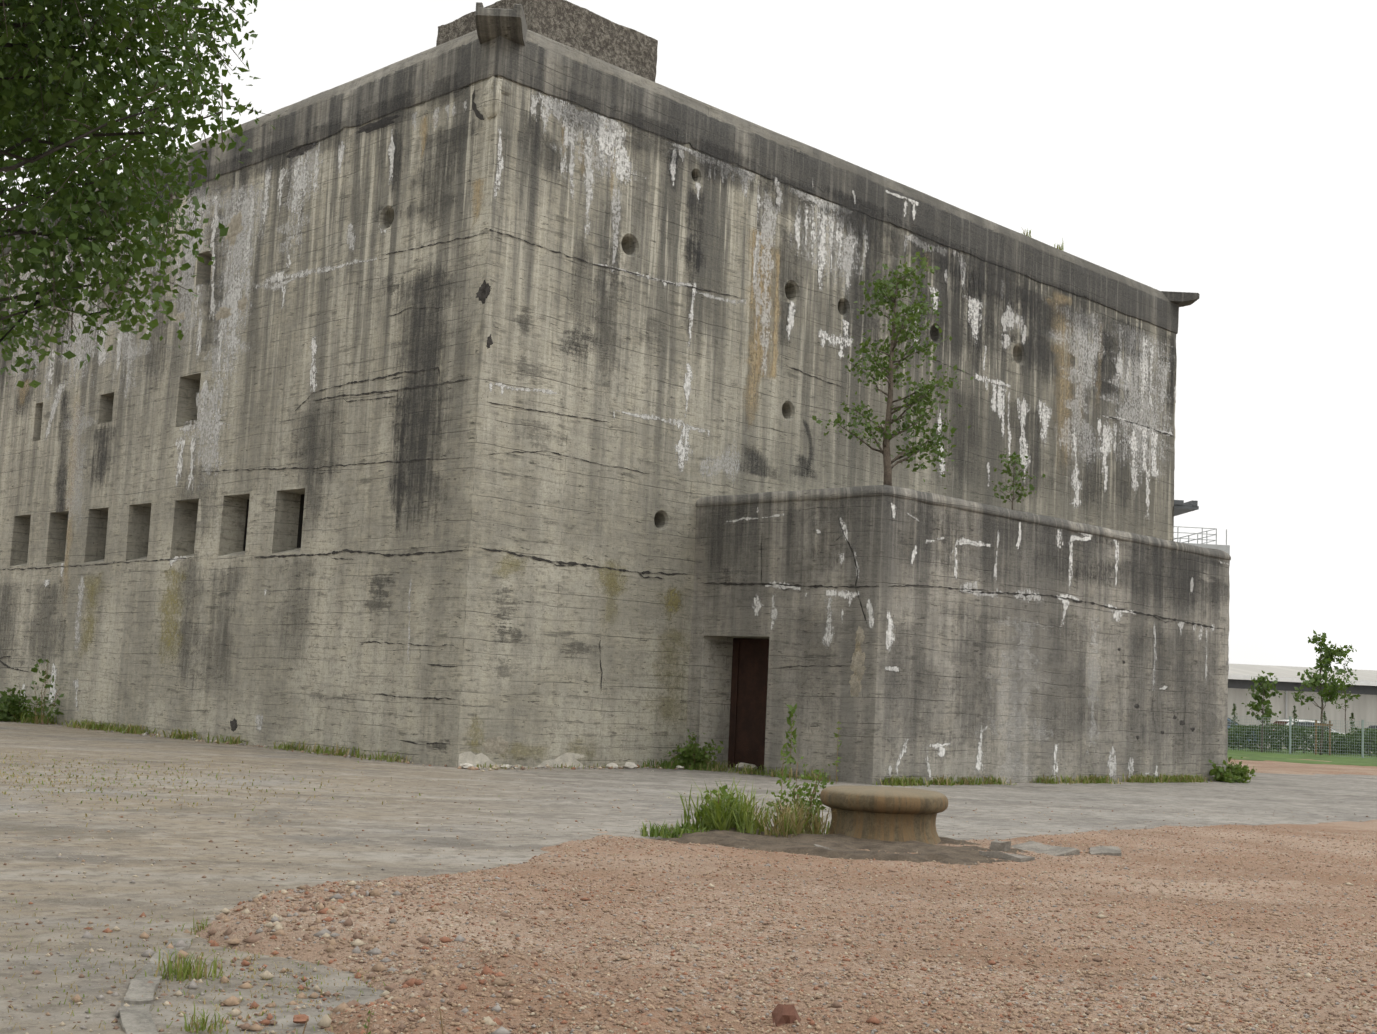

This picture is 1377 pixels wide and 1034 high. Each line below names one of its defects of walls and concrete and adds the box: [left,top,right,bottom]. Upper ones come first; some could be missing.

leakage [530,92,1058,482]
leakage [390,269,454,523]
leakage [489,382,555,395]
efflorescence [1071,426,1082,507]
leakage [1088,324,1176,519]
crack [3,557,196,570]
crack [254,518,1222,737]
leakage [752,581,807,630]
leakage [822,517,895,649]